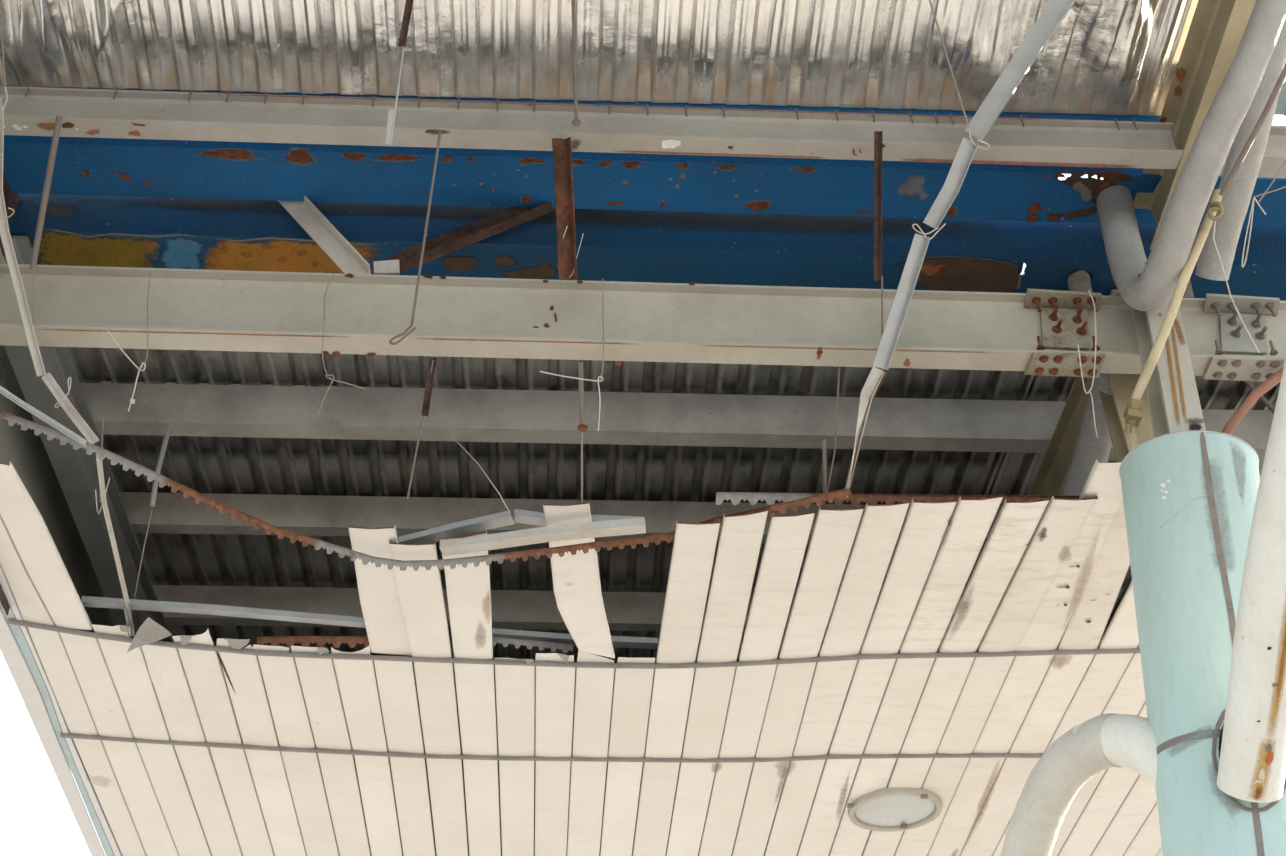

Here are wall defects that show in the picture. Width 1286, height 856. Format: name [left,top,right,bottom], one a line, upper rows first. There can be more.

corrosion [200,148,255,160]
corrosion [285,148,313,165]
corrosion [345,153,417,162]
corrosion [572,141,819,173]
corrosion [971,161,1128,193]
corrosion [746,200,771,211]
corrosion [917,256,1021,292]
corrosion [1253,615,1286,799]